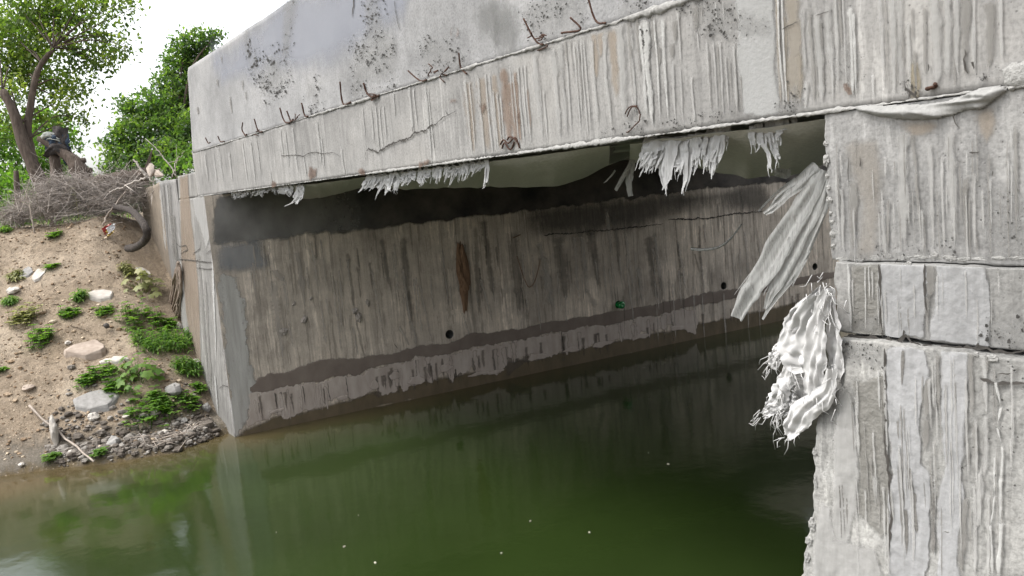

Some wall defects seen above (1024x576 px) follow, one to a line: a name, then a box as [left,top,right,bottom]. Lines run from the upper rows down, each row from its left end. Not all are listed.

water stain [215,0,404,97]
crack [365,110,455,159]
water stain [160,140,800,436]